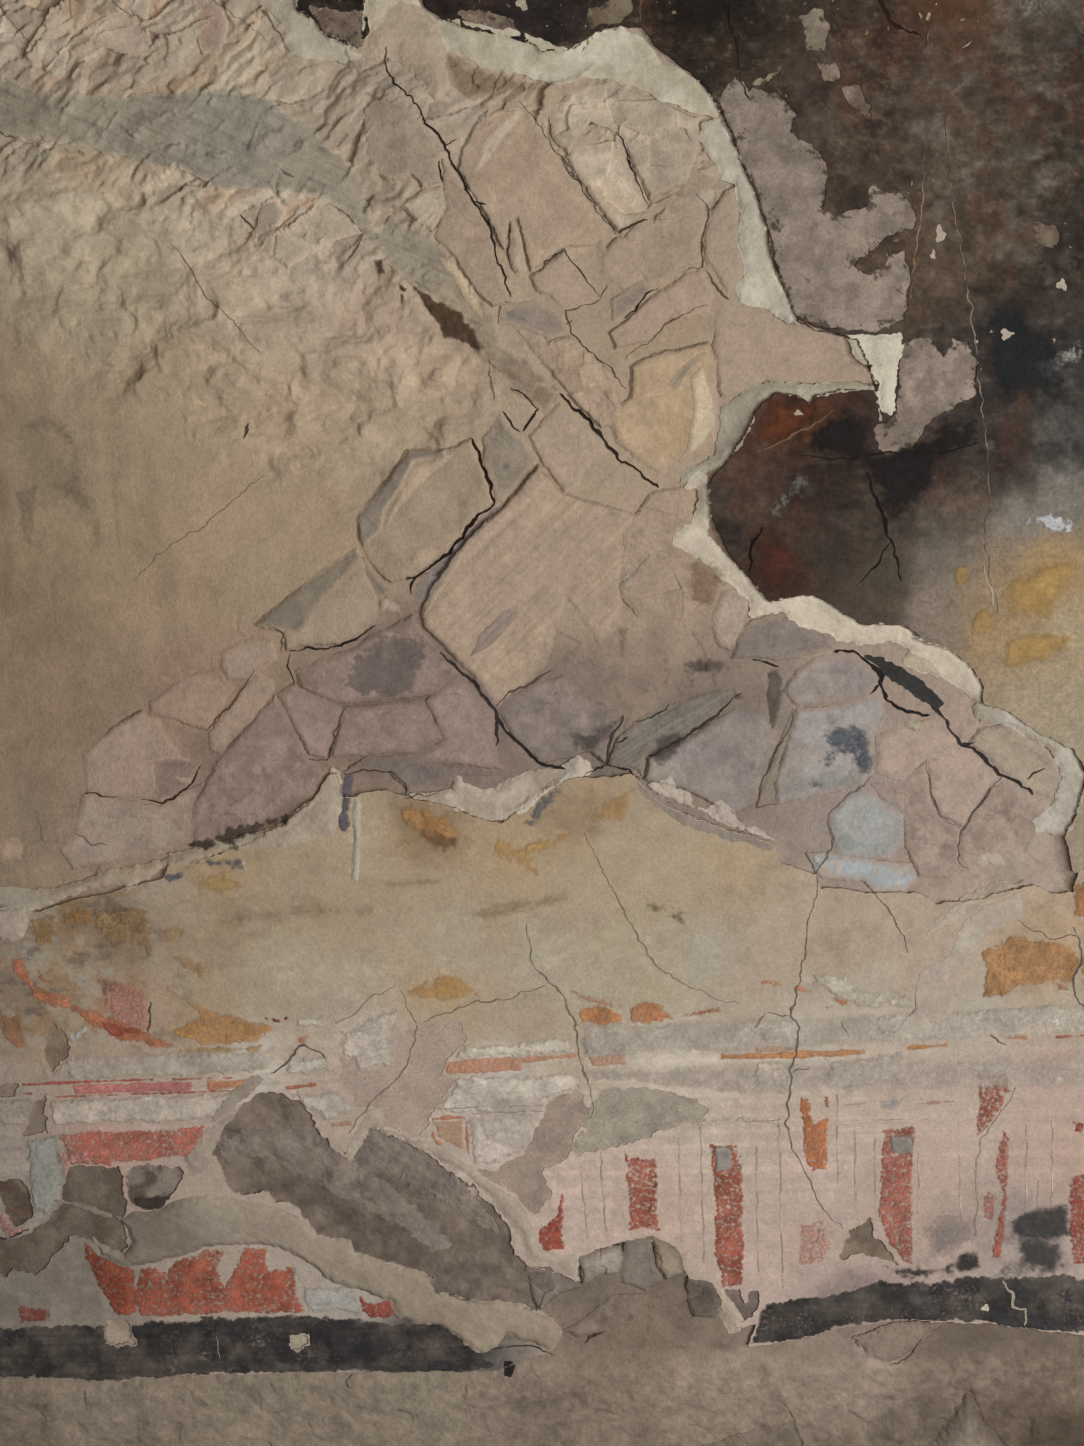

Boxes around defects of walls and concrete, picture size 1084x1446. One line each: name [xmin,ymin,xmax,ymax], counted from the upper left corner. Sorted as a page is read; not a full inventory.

flaking render [799,0,872,118]
crack [384,47,729,389]
flaking render [718,66,917,333]
crack [488,367,659,488]
flaking render [874,337,979,454]
crack [407,438,496,595]
crack [440,652,742,778]
crack [834,649,1046,869]
crack [584,777,871,1226]
flaking render [0,1163,184,1277]
flaking render [212,1021,708,1309]
flaking render [839,1217,898,1264]